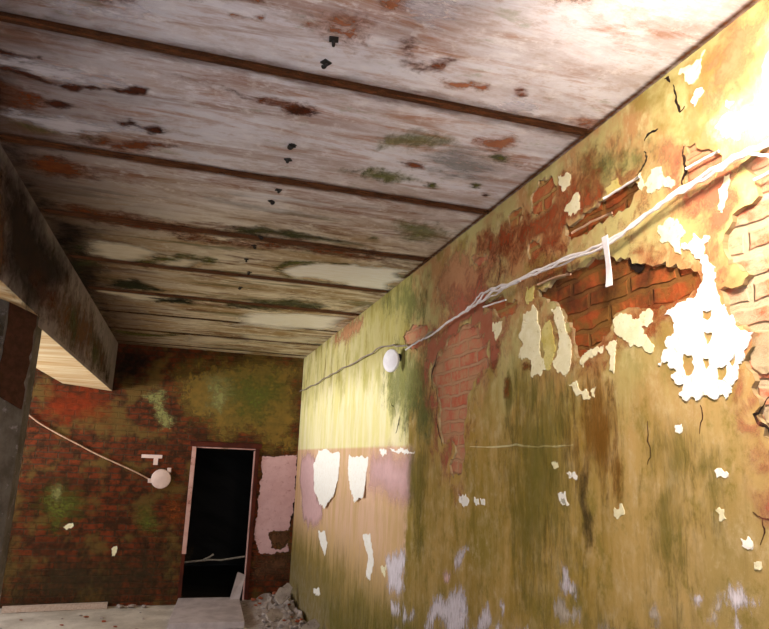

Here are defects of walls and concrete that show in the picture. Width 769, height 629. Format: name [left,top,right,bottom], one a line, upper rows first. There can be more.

water stain [0,49,101,110]
crack [664,76,685,113]
crack [635,128,658,176]
crack [680,146,688,185]
water stain [1,165,192,384]
spalling [430,140,769,479]
water stain [383,352,434,442]
crack [753,397,769,432]
peeling [174,354,411,556]
peeling [363,533,386,581]
water stain [386,549,414,629]
water stain [424,587,468,629]